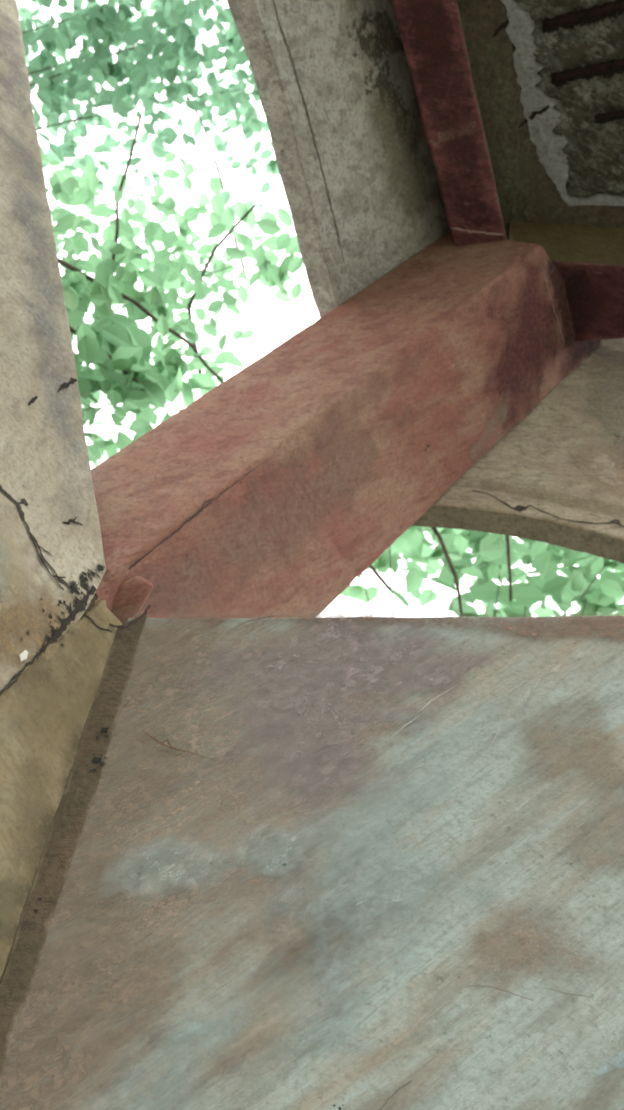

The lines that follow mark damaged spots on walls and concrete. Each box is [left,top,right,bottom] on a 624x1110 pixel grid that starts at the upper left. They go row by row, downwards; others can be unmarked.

spalling [501,0,624,206]
crack [0,485,151,695]
crack [472,490,624,527]